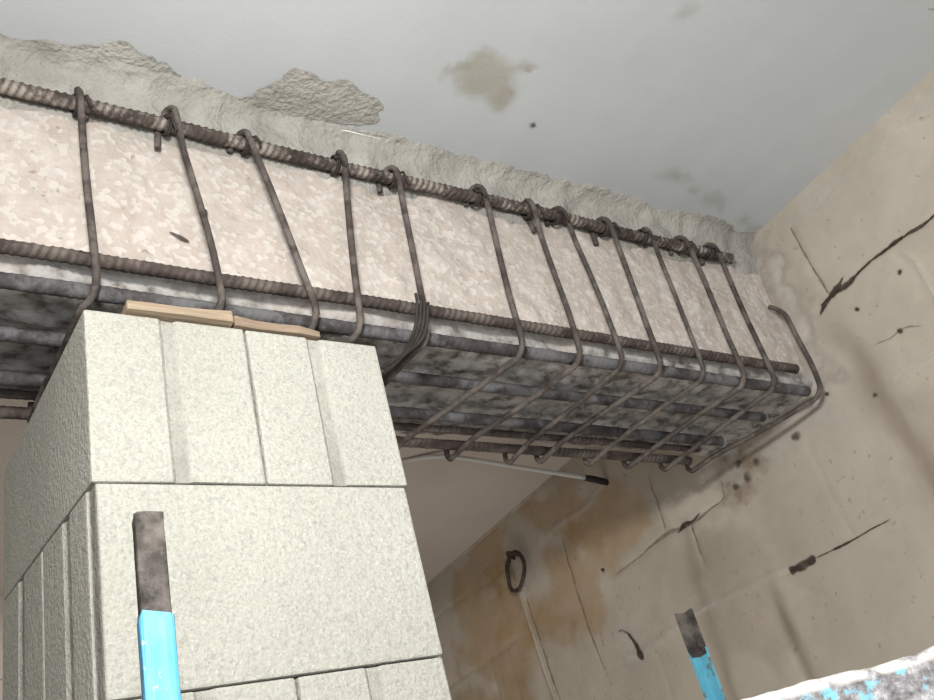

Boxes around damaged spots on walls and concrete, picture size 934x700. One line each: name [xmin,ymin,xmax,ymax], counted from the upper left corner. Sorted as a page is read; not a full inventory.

flaking render [62,41,181,77]
flaking render [239,68,384,139]
crack [814,214,934,315]
crack [789,520,888,574]